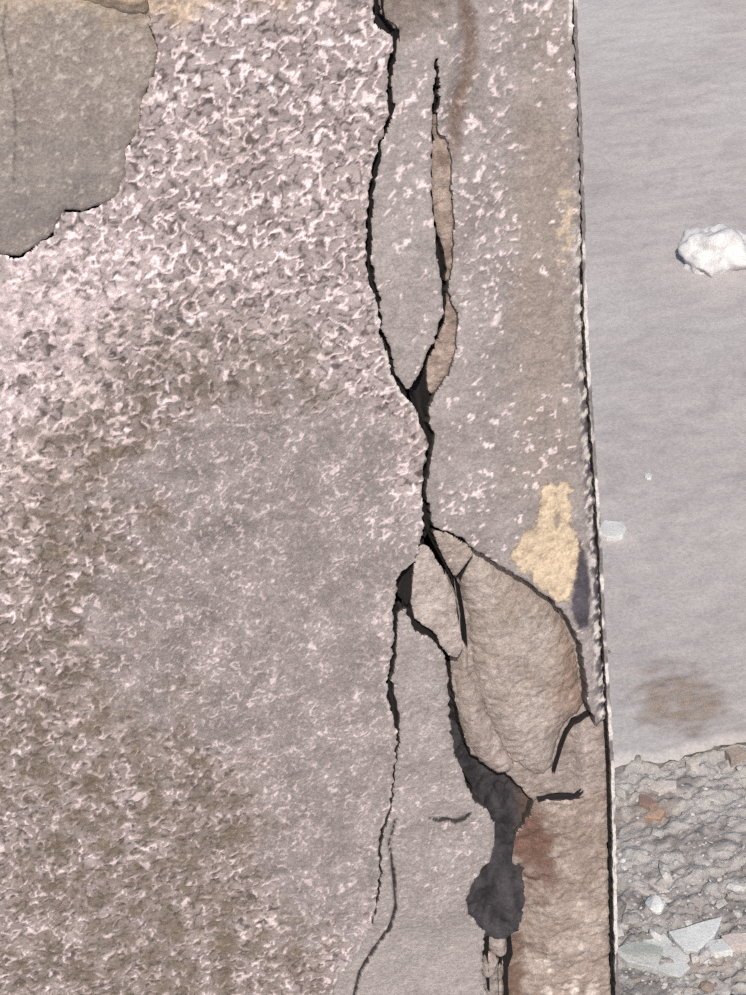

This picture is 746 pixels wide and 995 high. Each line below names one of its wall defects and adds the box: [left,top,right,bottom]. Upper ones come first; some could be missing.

spalling [0,0,158,257]
spalling [379,0,442,34]
crack [353,0,473,995]
crack [579,218,599,561]
crack [482,935,513,995]
spalling [396,482,611,995]
crack [537,631,615,995]